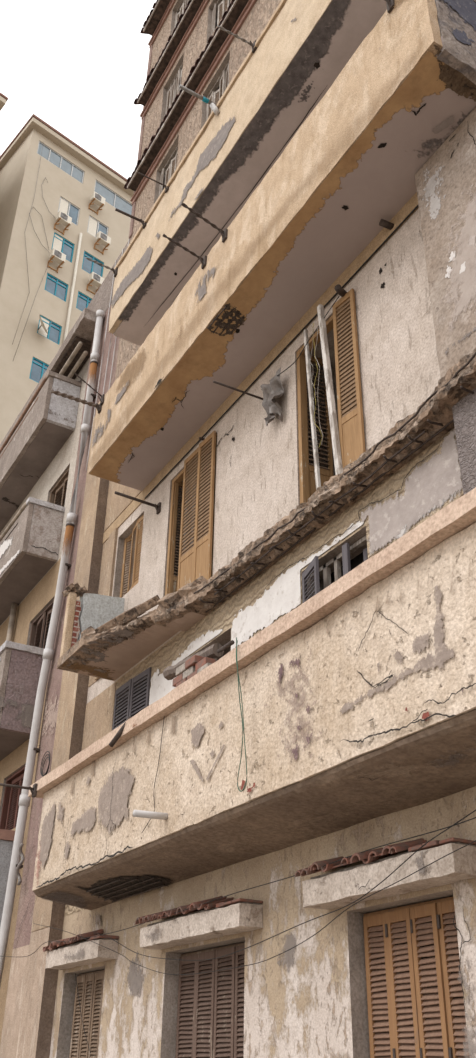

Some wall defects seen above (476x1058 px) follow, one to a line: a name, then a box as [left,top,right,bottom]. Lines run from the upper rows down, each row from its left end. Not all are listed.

peeling [444,0,476,48]
spalling [433,44,476,102]
peeling [111,116,235,308]
peeling [445,251,466,278]
spalling [207,303,245,336]
peeling [149,427,463,714]
crack [357,611,408,688]
crack [343,683,476,743]
peeling [38,767,134,868]
spalling [76,875,173,903]